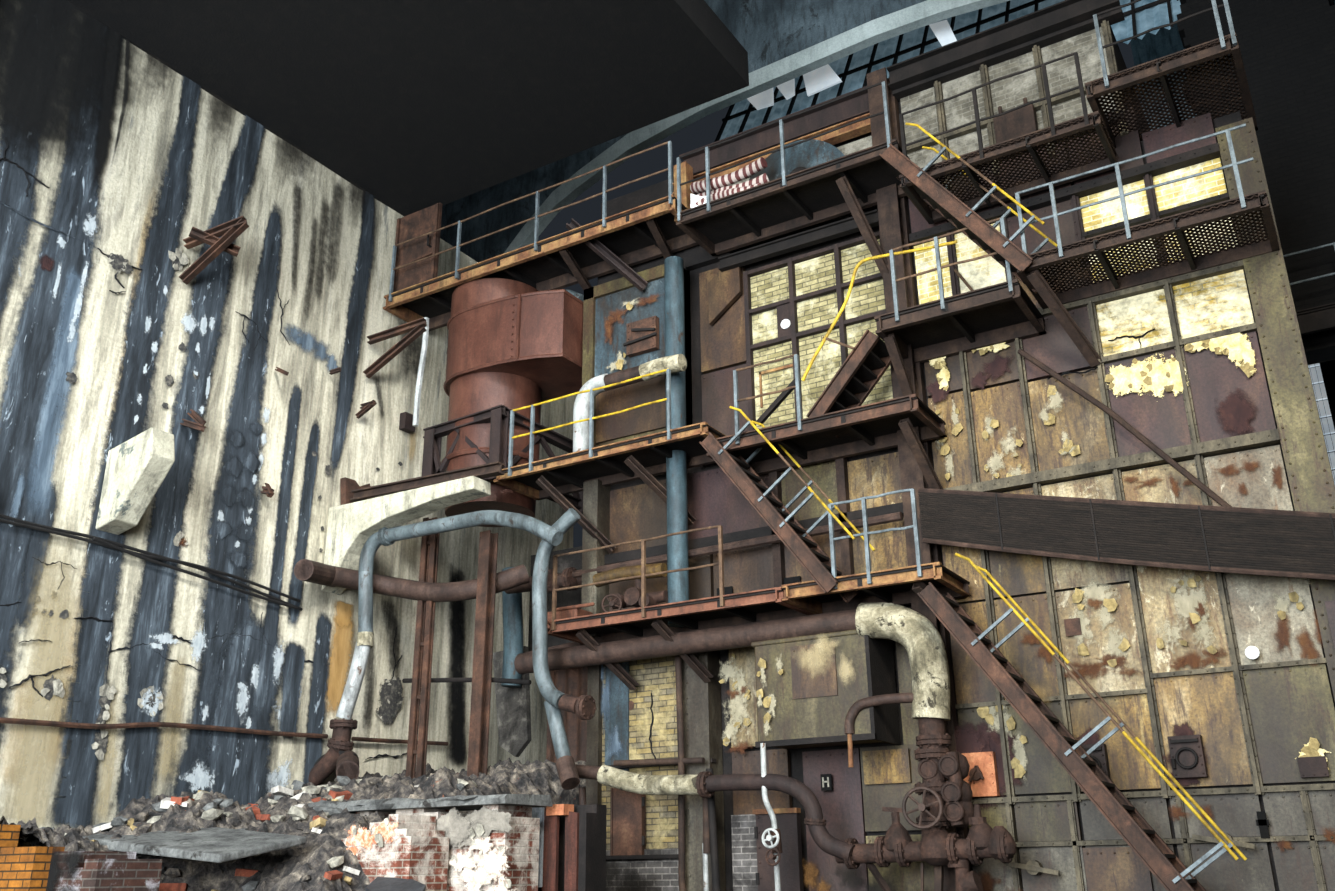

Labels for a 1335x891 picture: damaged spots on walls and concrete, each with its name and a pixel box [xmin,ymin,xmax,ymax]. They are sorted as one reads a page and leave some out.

water stain [0,0,374,828]
water stain [375,378,384,416]
peeling [1104,328,1256,397]
crack [9,639,71,697]
crack [74,612,312,684]
water stain [363,601,399,727]
crack [648,693,656,759]
peeling [719,653,783,746]
corrosion [1022,633,1135,679]
corrosion [1170,648,1226,670]
corrosion [1274,610,1322,659]
spalling [341,807,515,891]